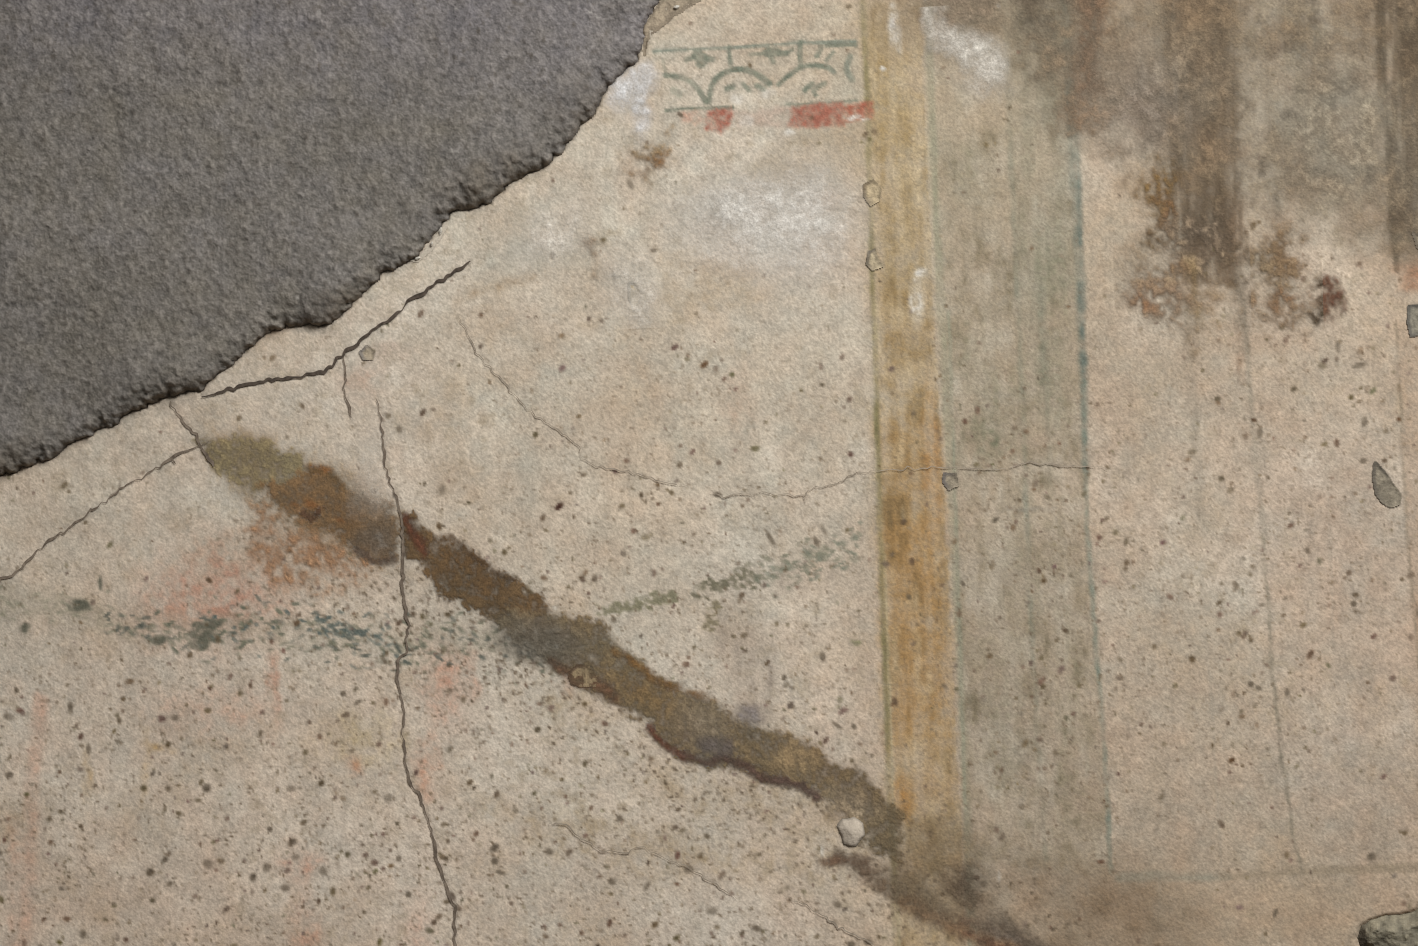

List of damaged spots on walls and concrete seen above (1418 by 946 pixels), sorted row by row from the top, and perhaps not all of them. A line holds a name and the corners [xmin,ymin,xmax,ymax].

flaking render [642,0,701,56]
water stain [921,0,1418,260]
flaking render [410,221,448,262]
flaking render [359,345,375,360]
crack [460,319,1104,503]
crack [0,261,471,946]
water stain [194,432,1042,946]
crack [549,823,737,899]